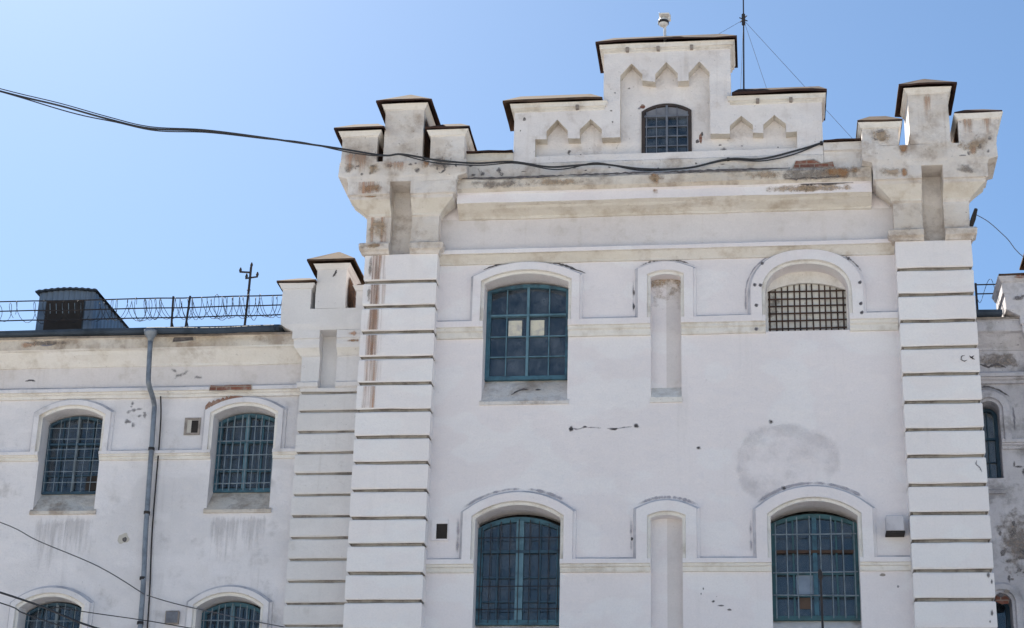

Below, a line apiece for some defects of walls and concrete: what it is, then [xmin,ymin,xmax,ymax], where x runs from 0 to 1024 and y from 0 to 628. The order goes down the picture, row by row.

spalling [784,159,854,191]